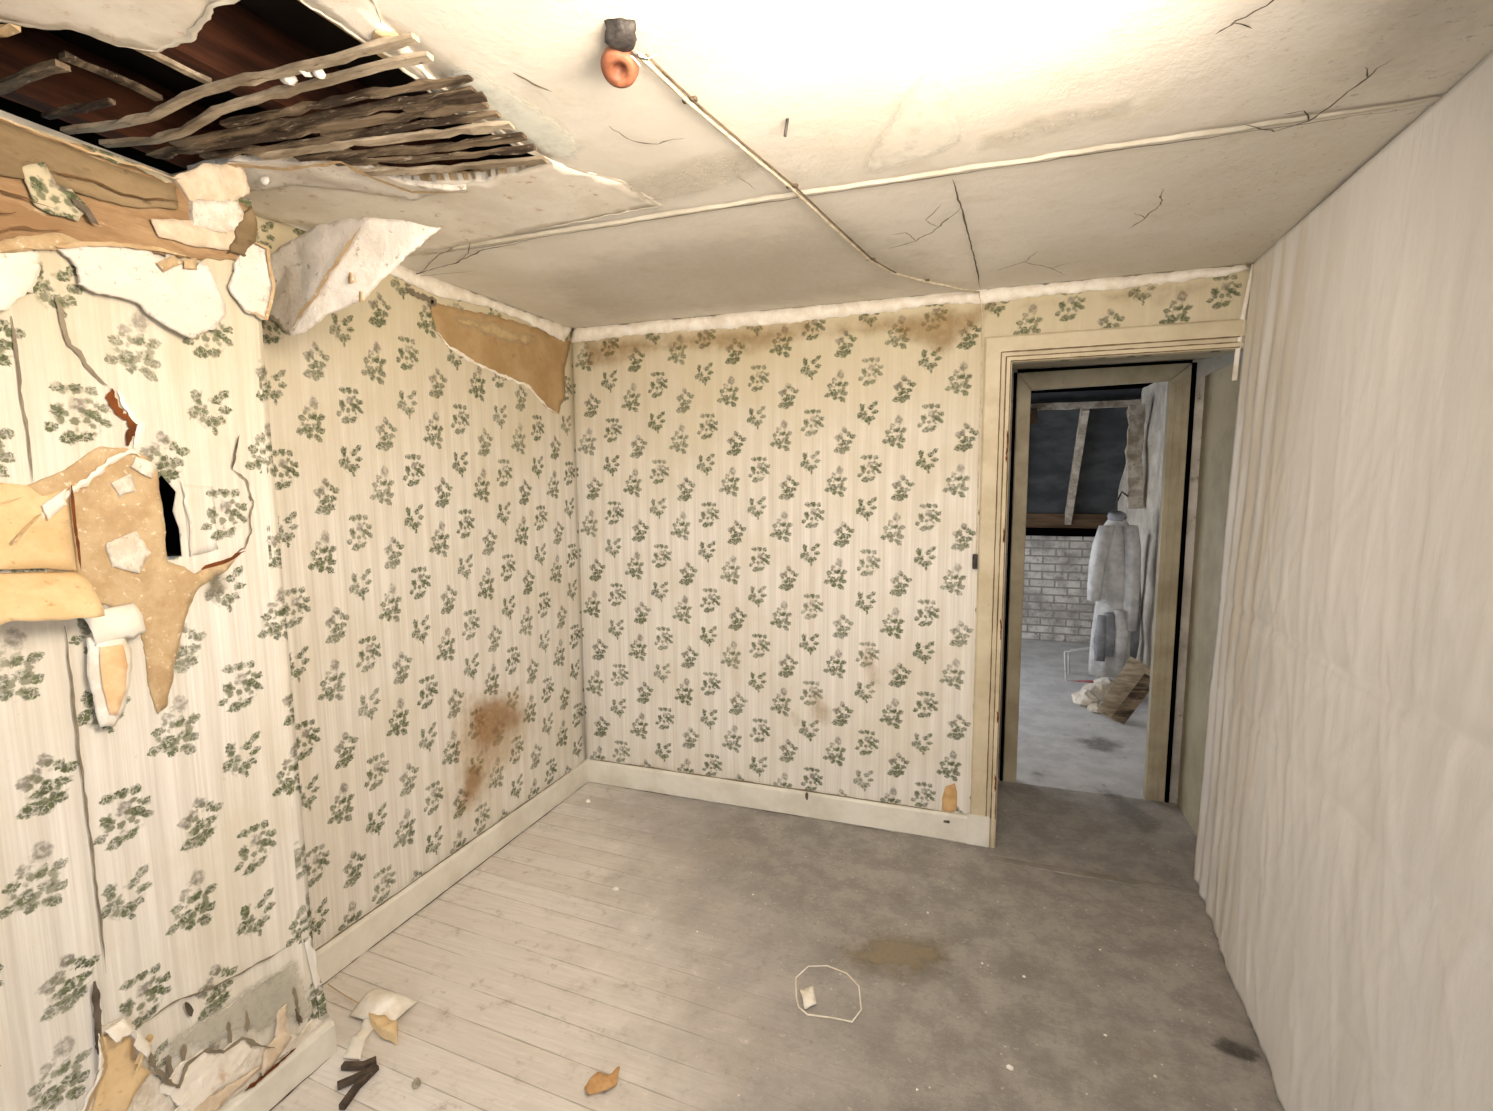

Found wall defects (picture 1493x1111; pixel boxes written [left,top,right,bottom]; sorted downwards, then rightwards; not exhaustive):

peeling [373,30,398,40]
crack [1216,0,1274,34]
spalling [344,148,533,182]
crack [416,58,1436,289]
peeling [0,243,41,311]
peeling [56,154,275,338]
peeling [405,287,437,310]
spalling [159,476,181,557]
spalling [77,1003,325,1111]